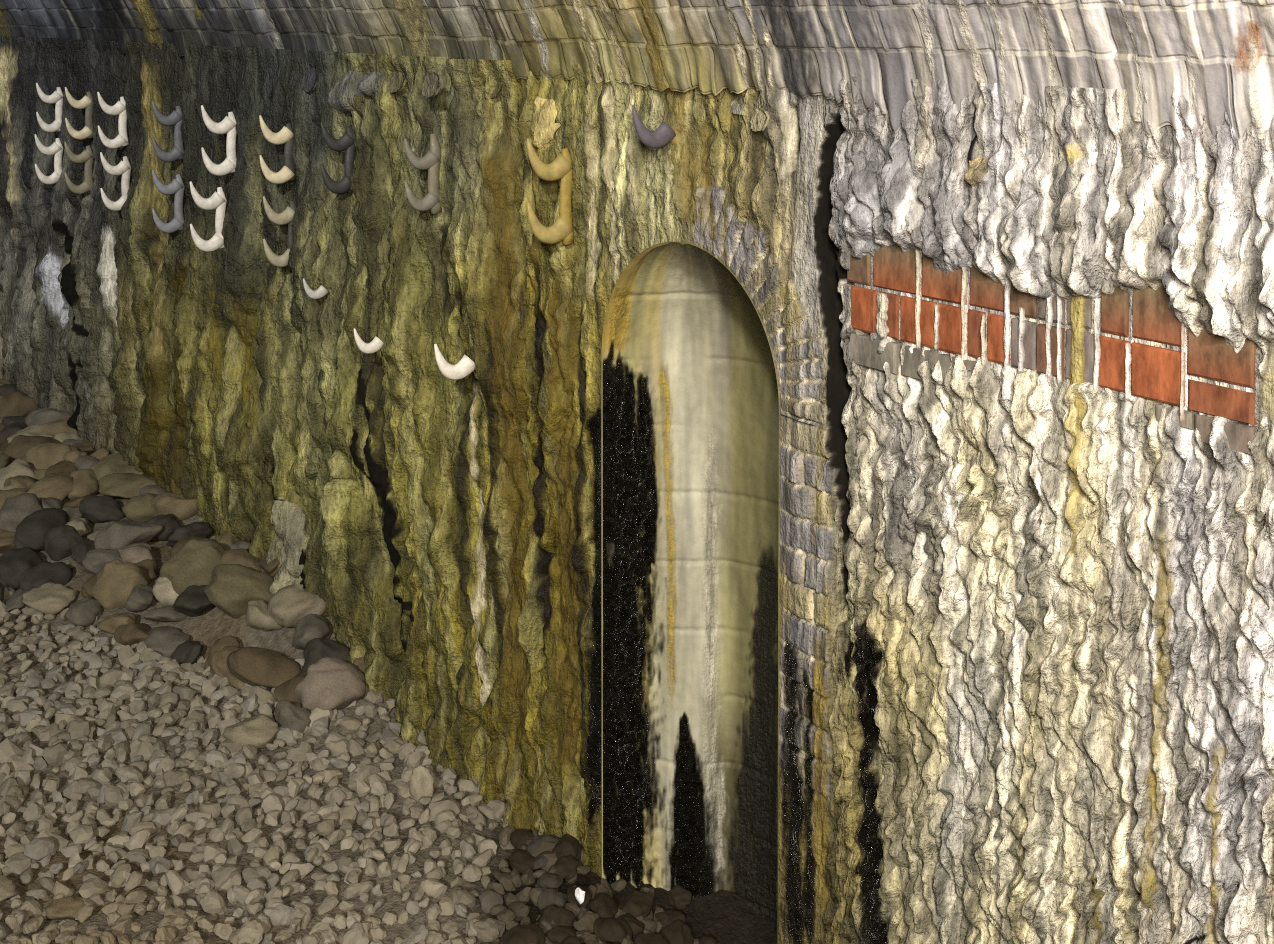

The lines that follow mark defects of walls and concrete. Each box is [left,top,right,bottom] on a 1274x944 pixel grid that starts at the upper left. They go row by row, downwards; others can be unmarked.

efflorescence [39,251,69,325]
leakage [140,343,188,494]
leakage [366,361,386,465]
leakage [440,225,463,337]
leakage [454,271,551,709]
leakage [571,0,817,944]
spalling [847,245,1258,455]
leakage [845,622,887,944]
leakage [1209,759,1221,942]